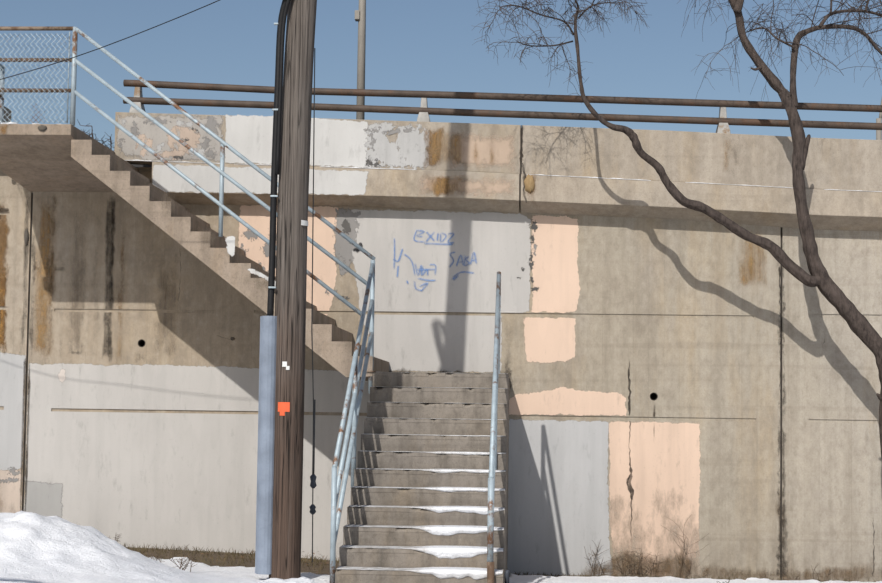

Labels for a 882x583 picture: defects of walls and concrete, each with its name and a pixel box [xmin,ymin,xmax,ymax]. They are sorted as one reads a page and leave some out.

peeling [116,114,223,162]
peeling [364,122,432,170]
corrosion [426,130,460,165]
corrosion [433,178,457,194]
peeling [333,208,361,275]
corrosion [36,209,53,348]
leakage [104,202,114,353]
crack [626,362,634,532]